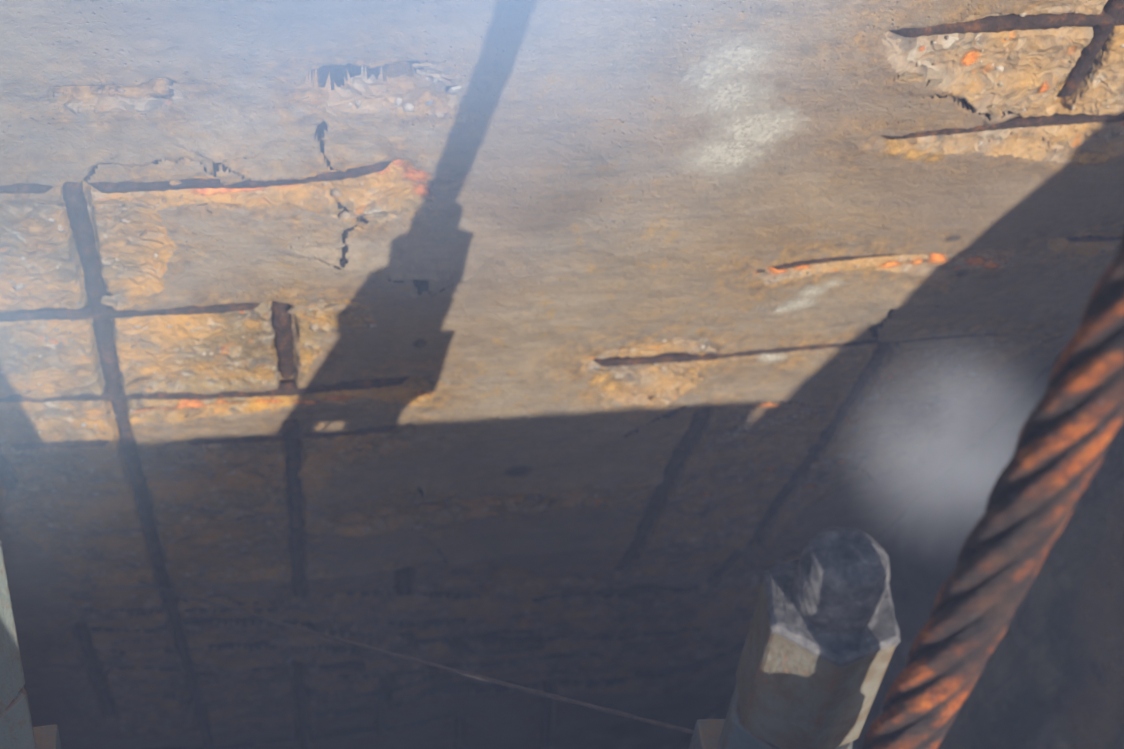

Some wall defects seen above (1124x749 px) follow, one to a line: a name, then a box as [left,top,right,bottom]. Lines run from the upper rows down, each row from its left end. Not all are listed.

spalling [881,0,1124,163]
crack [314,121,337,171]
rust [194,187,263,195]
crack [325,202,368,270]
crack [383,275,444,296]
rust [768,265,809,274]
spalling [745,248,1016,312]
rust [880,253,946,268]
crack [869,306,939,342]
spalling [0,159,442,589]
spalling [580,336,719,411]
spalling [631,334,1042,576]